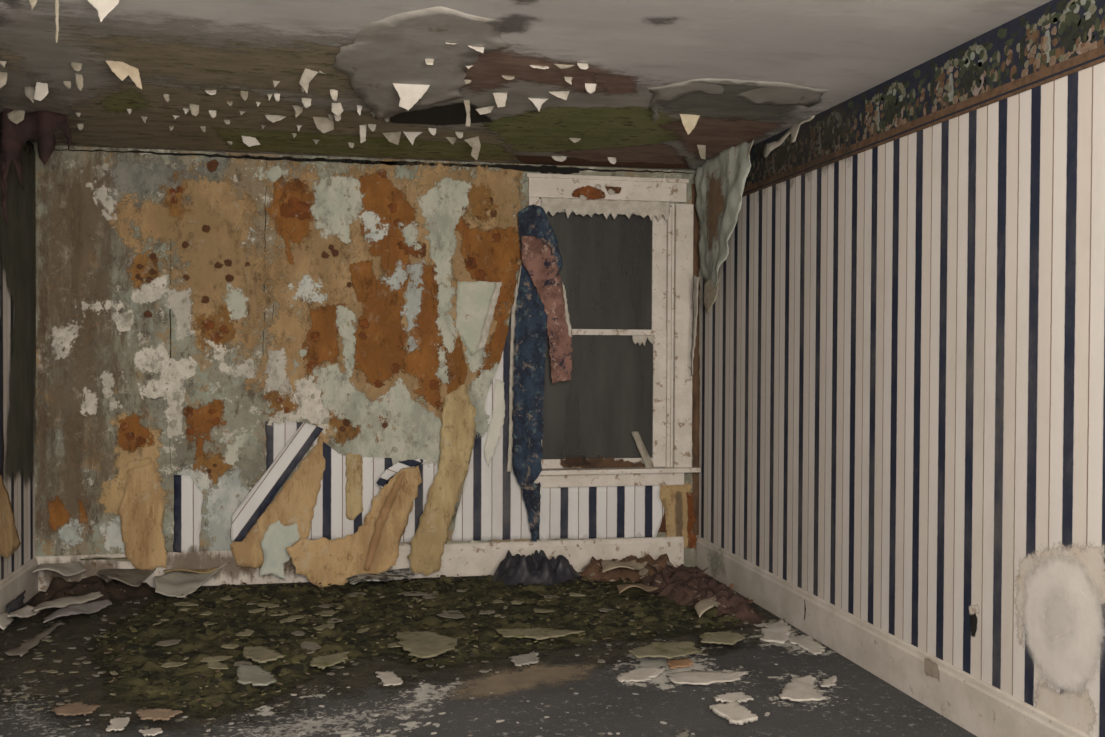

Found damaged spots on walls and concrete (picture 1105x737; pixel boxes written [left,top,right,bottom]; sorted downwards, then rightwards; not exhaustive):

peeling [87,0,119,22]
peeling [7,82,49,124]
peeling [105,60,142,89]
peeling [169,68,343,147]
peeling [348,75,515,160]
peeling [528,62,588,112]
peeling [680,114,700,135]
damp [0,0,810,539]
peeling [309,174,502,438]
peeling [48,274,199,439]
peeling [177,272,442,551]
damp [675,492,697,548]